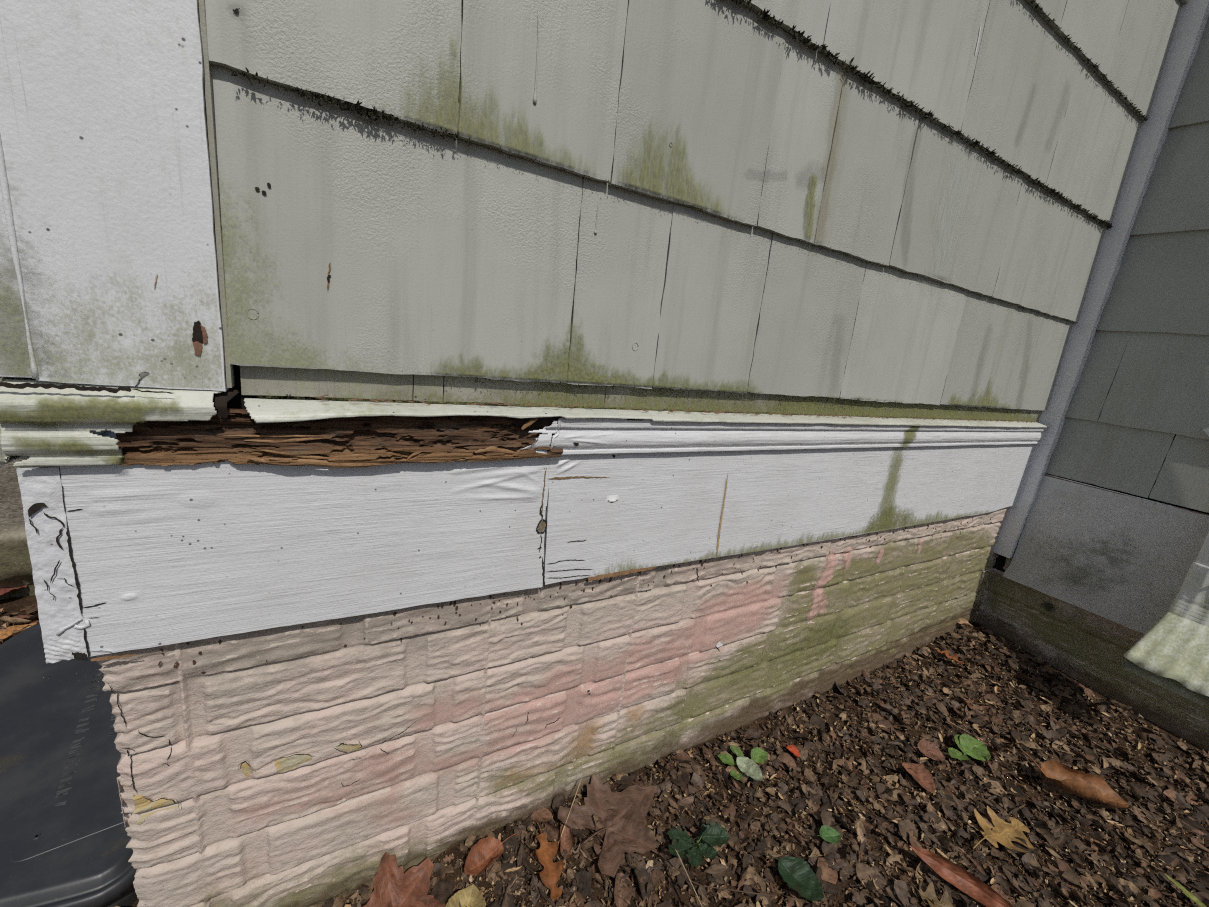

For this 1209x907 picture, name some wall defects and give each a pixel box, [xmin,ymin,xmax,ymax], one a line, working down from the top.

leakage [806,176,817,237]
spalling [514,417,561,453]
crack [28,484,106,658]
crack [536,468,609,586]
leakage [807,548,852,620]
crack [107,682,172,792]